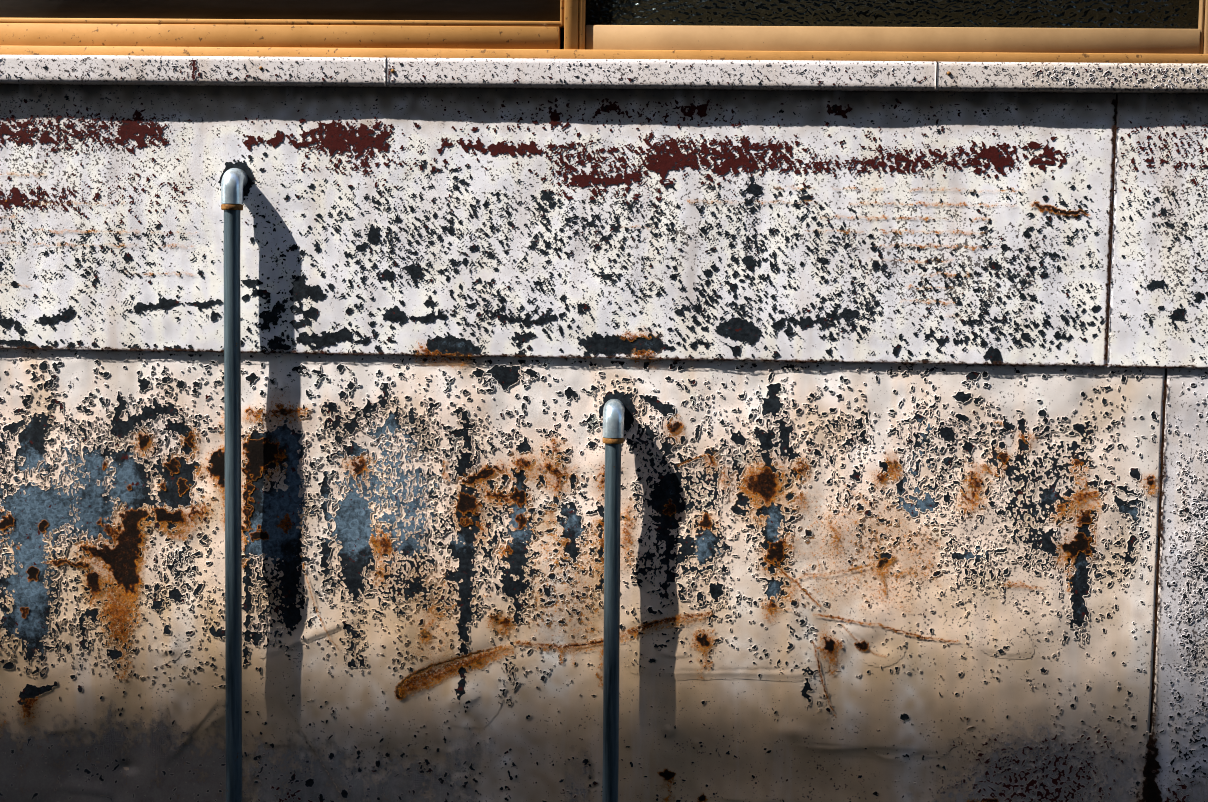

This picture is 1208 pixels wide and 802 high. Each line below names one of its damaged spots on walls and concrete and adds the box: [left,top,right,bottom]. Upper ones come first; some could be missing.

peeling [0,104,404,225]
peeling [0,295,87,356]
peeling [120,293,224,325]
peeling [160,341,224,363]
peeling [241,96,1208,720]
corrosion [0,510,14,542]
peeling [0,370,225,708]
corrosion [26,413,225,679]
peeling [951,719,1126,802]
peeling [1164,778,1199,802]